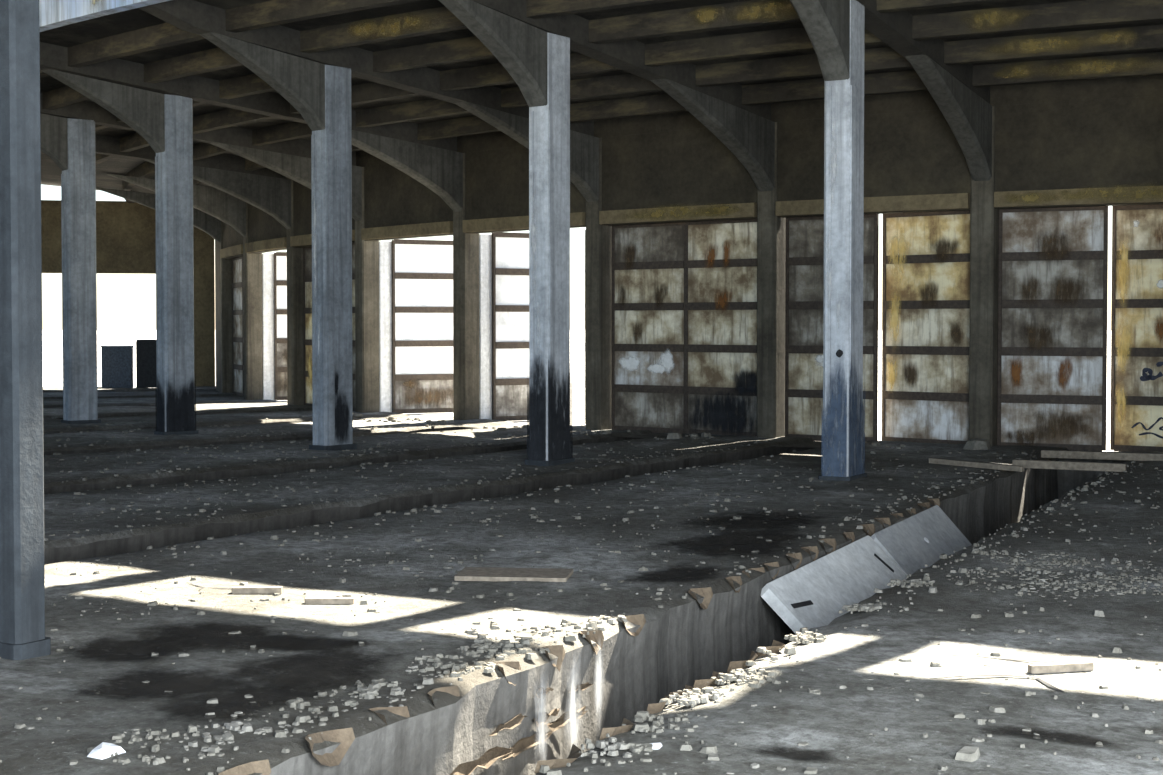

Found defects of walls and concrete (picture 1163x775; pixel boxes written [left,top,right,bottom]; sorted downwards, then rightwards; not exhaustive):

rust [1119,246,1129,300]
water stain [155,378,196,432]
water stain [527,359,573,461]
water stain [620,352,673,373]
water stain [690,370,757,434]
rust [888,363,897,388]
rust [890,295,899,340]
rust [1117,391,1126,424]
rust [1118,327,1130,368]
rust [1155,319,1163,341]
spalling [218,458,1129,775]
water stain [64,623,392,721]